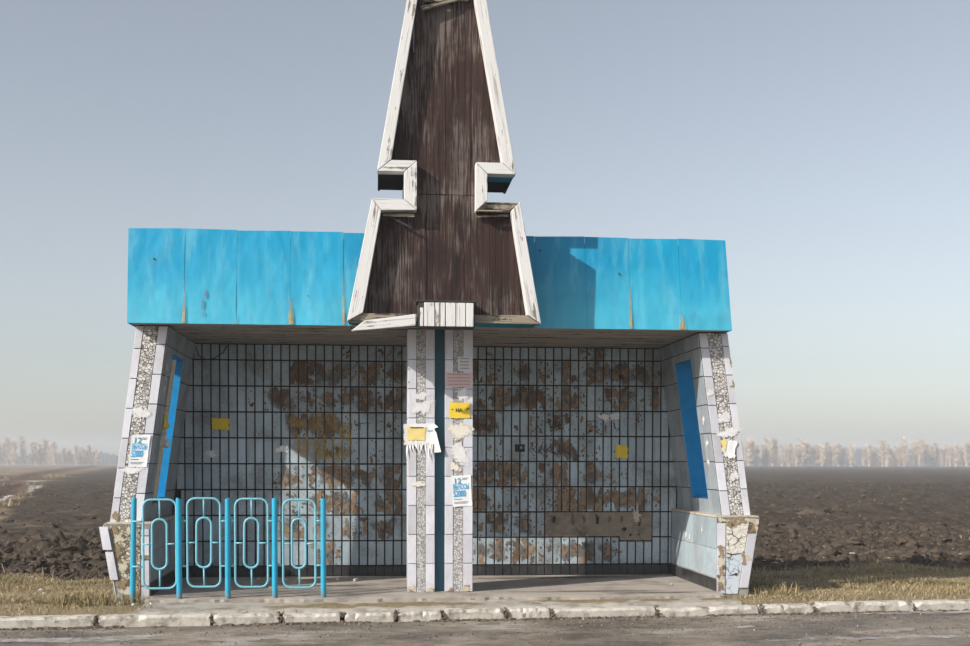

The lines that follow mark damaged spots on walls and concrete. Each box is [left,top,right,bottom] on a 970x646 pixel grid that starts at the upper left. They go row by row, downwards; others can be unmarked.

peeling [248,346,405,565]
peeling [472,348,661,564]
peeling [717,545,726,591]
spalling [718,517,759,533]